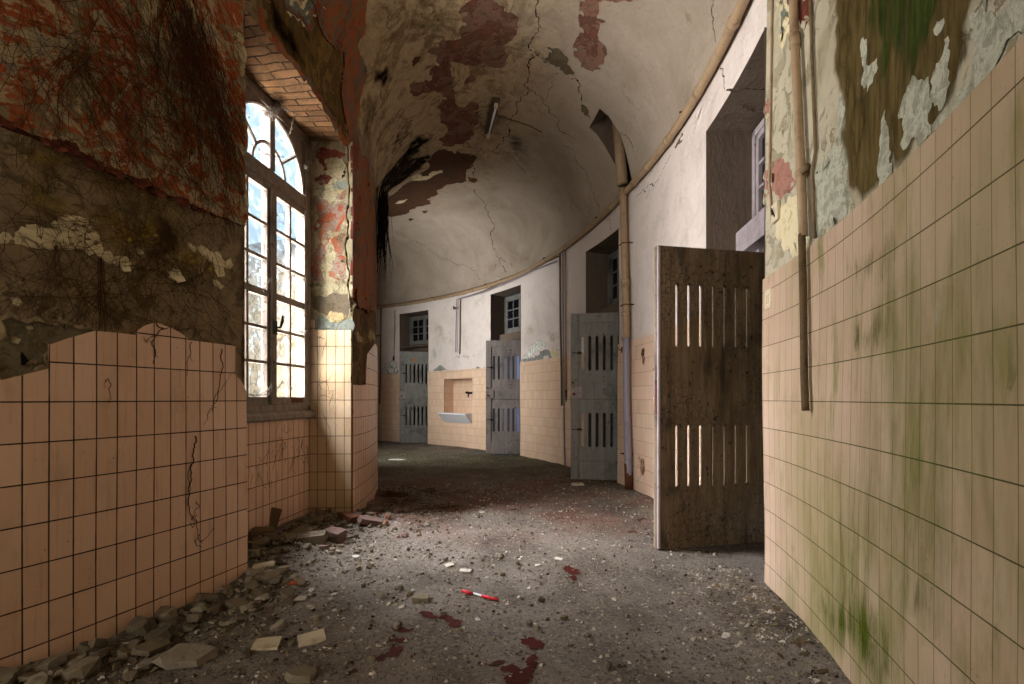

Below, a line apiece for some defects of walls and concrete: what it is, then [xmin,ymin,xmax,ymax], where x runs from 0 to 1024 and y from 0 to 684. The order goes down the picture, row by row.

peeling [0,0,523,385]
damp [381,128,431,192]
crack [394,0,584,280]
peeling [530,0,640,78]
damp [765,0,1009,278]
damp [996,31,1024,65]